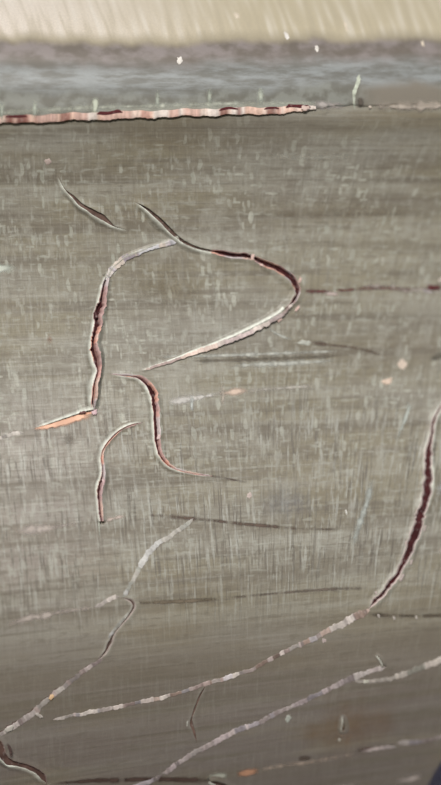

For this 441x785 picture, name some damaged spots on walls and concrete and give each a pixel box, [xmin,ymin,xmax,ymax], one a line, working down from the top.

crack [0,74,441,124]
crack [34,197,441,535]
crack [0,397,441,785]